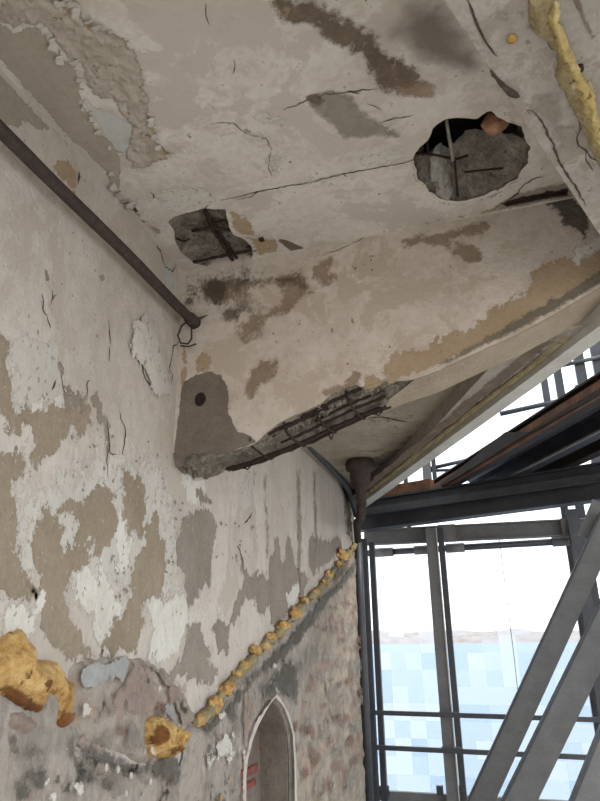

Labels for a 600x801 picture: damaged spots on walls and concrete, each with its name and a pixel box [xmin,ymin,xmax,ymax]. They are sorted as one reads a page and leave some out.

leakage [273,0,434,97]
crack [467,0,497,56]
flaking render [0,0,173,236]
crack [200,123,446,214]
spalling [415,119,503,197]
crack [526,110,586,206]
spalling [169,208,268,266]
leakage [402,207,504,263]
leakage [186,257,336,344]
spalling [187,188,600,480]
crack [106,414,126,475]
flaking render [0,333,366,801]